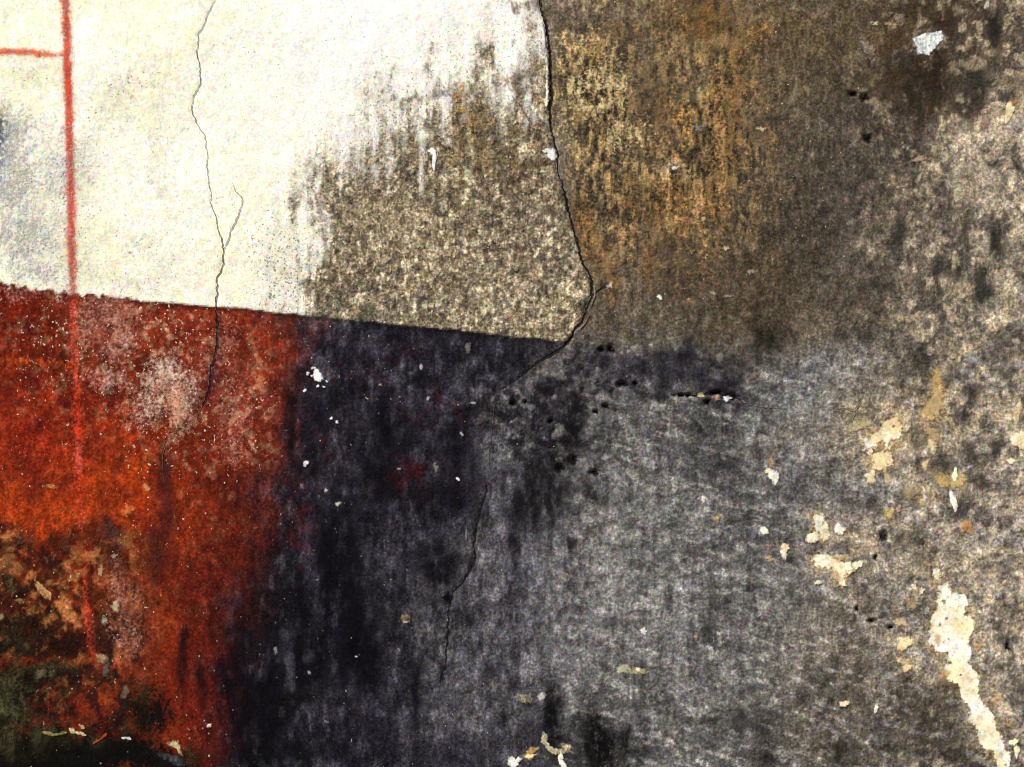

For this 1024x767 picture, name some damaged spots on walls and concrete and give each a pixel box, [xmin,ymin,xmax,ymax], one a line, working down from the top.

crack [162,1,242,484]
rust [572,0,792,311]
leakage [294,501,377,692]
leakage [410,547,464,596]
crack [438,0,607,692]
leakage [512,453,570,532]
leakage [532,376,588,459]
leakage [544,682,637,767]
leakage [584,484,599,503]
spalling [889,564,1020,767]